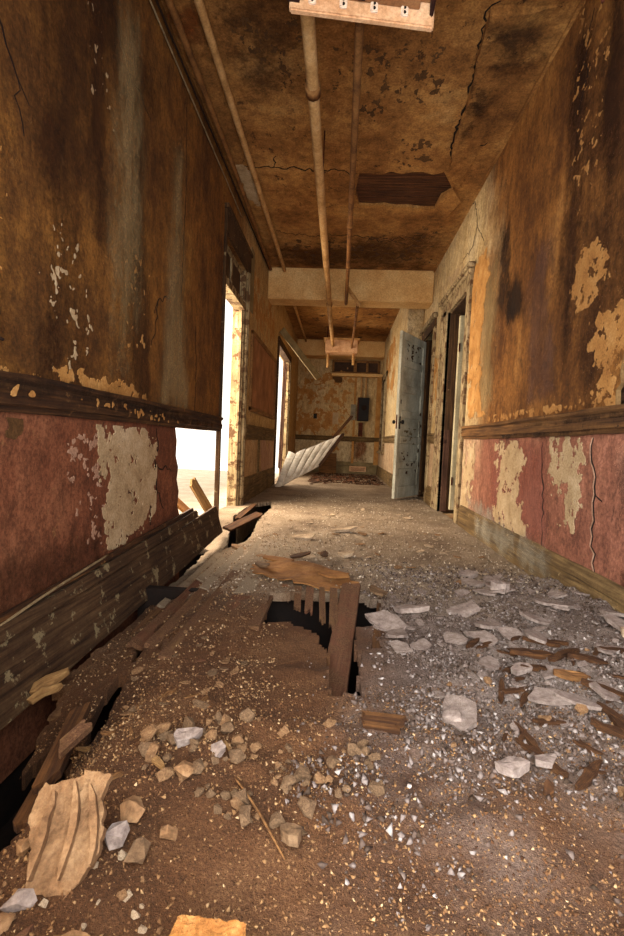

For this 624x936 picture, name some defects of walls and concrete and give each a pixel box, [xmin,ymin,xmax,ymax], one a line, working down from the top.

crack [450,1,501,159]
peeling [572,2,611,188]
peeling [11,384,36,397]
peeling [49,223,93,335]
peeling [52,340,179,551]
peeling [492,440,528,537]
peeling [467,236,624,422]
peeling [547,436,586,534]
crack [589,437,602,572]